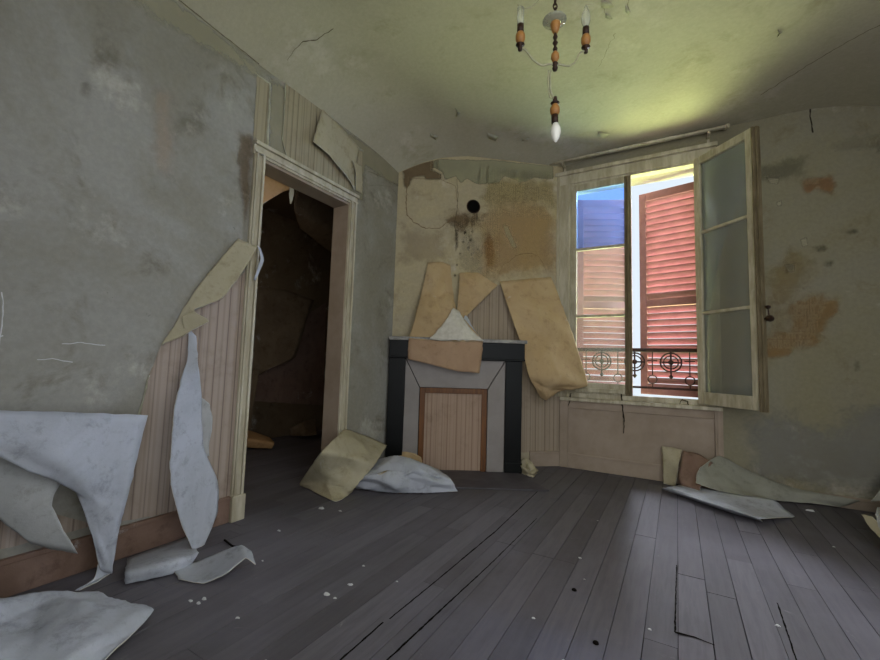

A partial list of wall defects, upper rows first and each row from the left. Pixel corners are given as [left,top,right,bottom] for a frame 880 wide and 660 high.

peeling [282,83,350,190]
peeling [467,285,520,340]
peeling [121,272,245,521]
peeling [0,520,28,549]